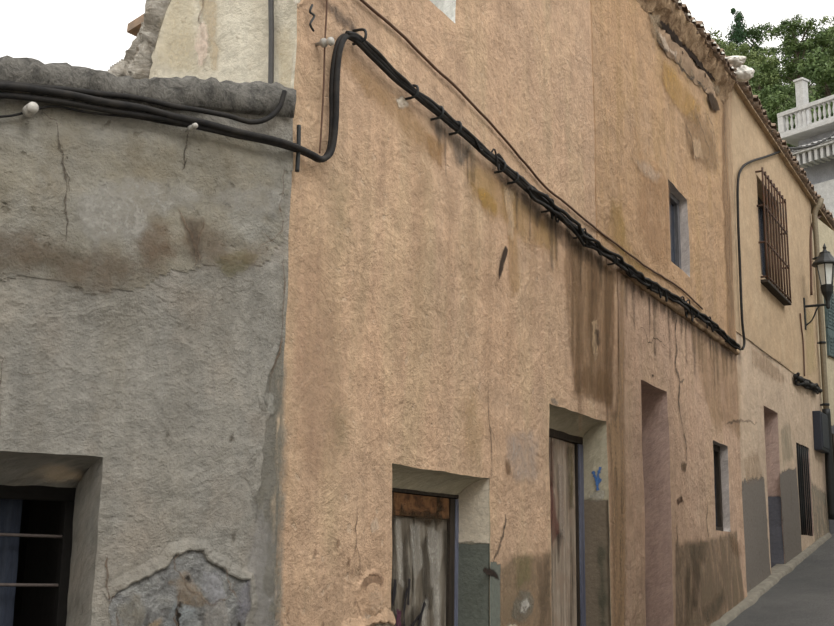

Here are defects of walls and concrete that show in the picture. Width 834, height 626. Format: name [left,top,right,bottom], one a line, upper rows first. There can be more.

crack [44,113,70,235]
spalling [650,14,736,341]
crack [646,314,687,460]
spalling [102,338,286,626]
spalling [339,608,396,626]